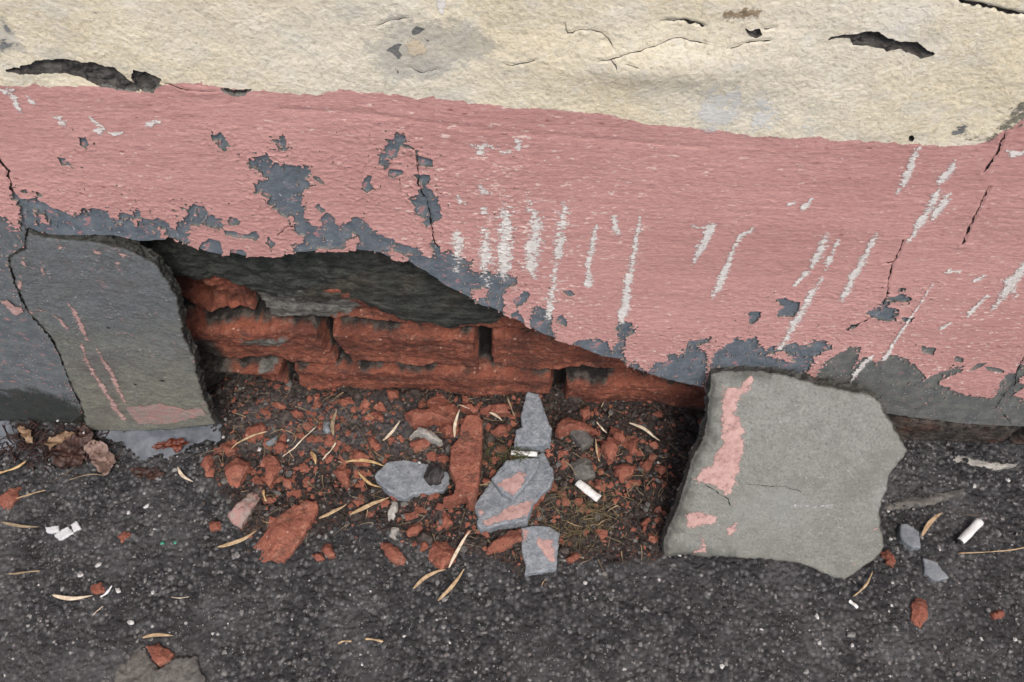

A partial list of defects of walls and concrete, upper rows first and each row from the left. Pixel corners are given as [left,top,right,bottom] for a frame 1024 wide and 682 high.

flaking render [12,59,161,90]
crack [565,19,706,69]
flaking render [849,31,932,57]
peeling [212,132,229,150]
peeling [379,132,442,226]
crack [416,157,438,247]
leakage [449,183,571,321]
flaking render [0,153,1024,506]
leakage [777,232,840,350]
crack [847,240,904,331]
leakage [907,188,952,243]
crack [962,134,1005,245]